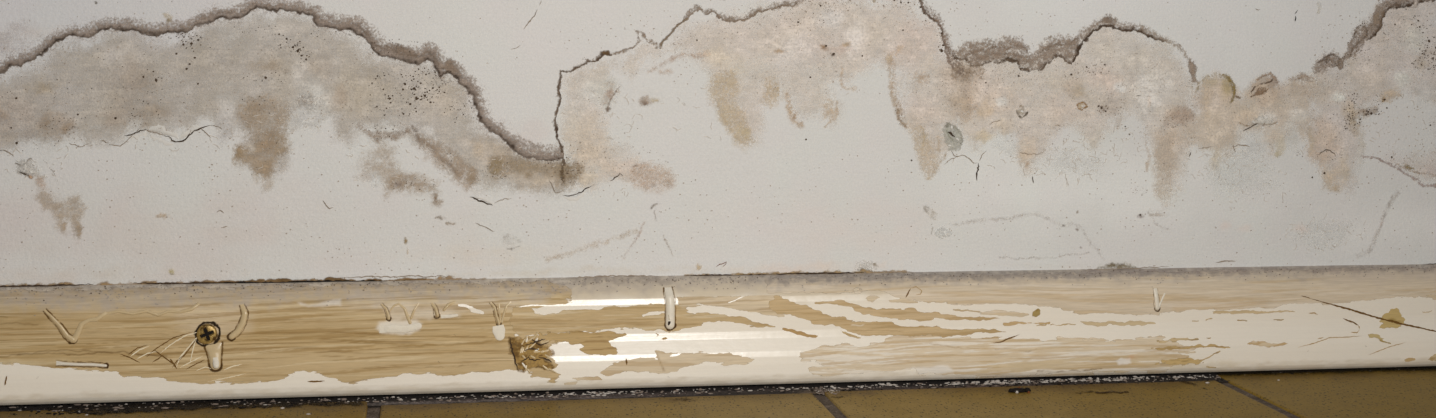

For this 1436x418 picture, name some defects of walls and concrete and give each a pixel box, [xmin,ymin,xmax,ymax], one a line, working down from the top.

water stain [0,0,1436,236]
crack [72,124,223,147]
spalling [943,123,963,150]
spalling [15,158,55,178]
peeling [0,259,1436,385]